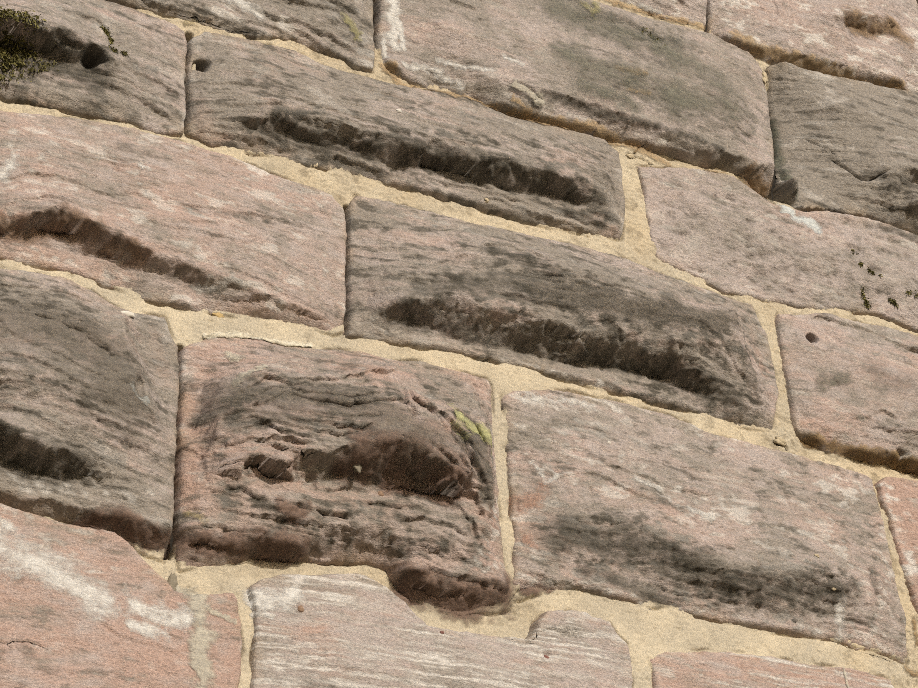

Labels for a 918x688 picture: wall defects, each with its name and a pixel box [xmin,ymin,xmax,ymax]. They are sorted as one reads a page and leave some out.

damp [0,519,115,619]
damp [126,597,195,637]